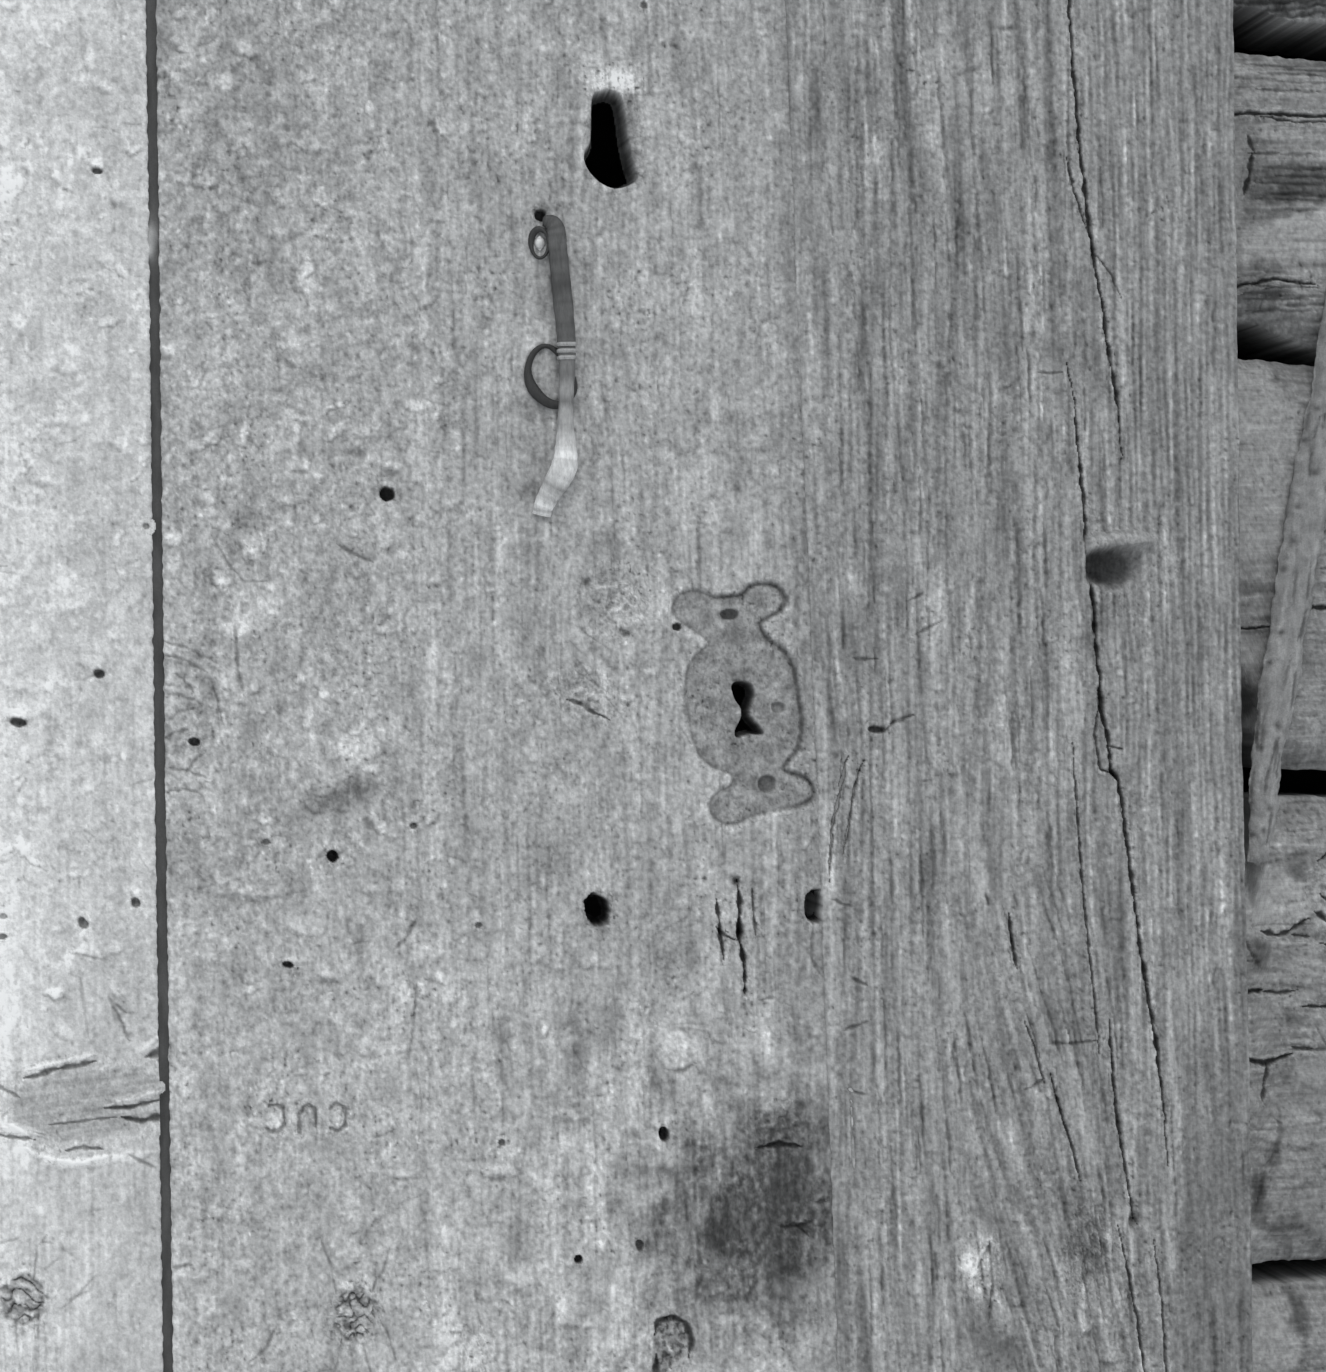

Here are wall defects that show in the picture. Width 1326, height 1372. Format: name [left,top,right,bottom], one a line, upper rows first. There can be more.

crack [1019,1015,1087,1187]
crack [1060,0,1175,1372]